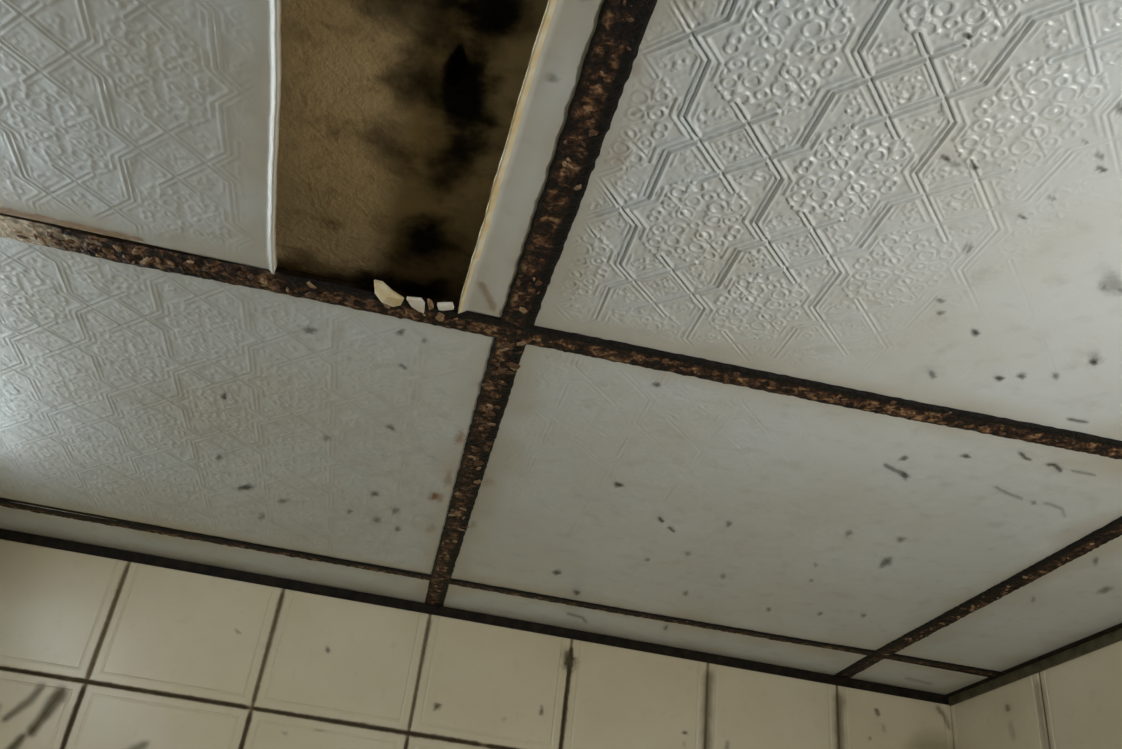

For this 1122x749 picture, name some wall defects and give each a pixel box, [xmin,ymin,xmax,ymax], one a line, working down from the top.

damp [368,0,523,39]
damp [394,54,494,189]
rust [562,139,581,190]
damp [405,219,451,260]
rust [12,230,355,303]
damp [355,271,446,299]
peeling [374,279,454,313]
rust [516,275,542,313]
rust [402,341,527,603]